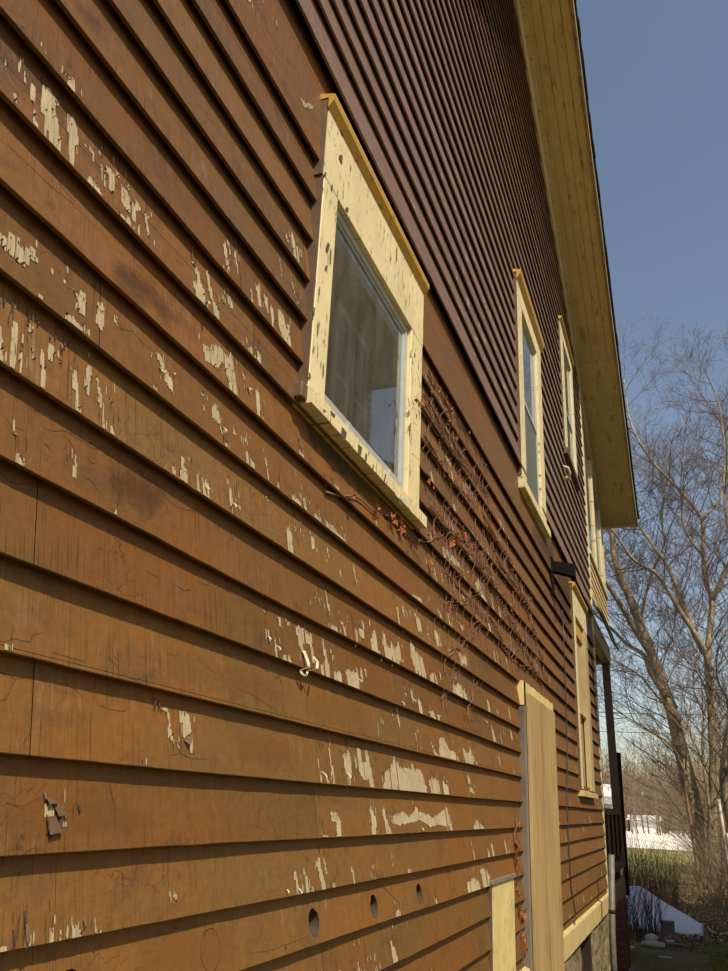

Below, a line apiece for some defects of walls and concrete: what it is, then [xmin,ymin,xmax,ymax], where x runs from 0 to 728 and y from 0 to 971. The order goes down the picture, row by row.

peeling [0,43,155,246]
peeling [0,232,38,267]
peeling [51,266,123,336]
peeling [190,248,234,319]
peeling [248,274,295,347]
peeling [0,297,120,435]
peeling [198,335,264,418]
peeling [264,609,367,689]
peeling [308,528,524,734]
peeling [412,723,477,765]
peeling [317,740,452,835]
peeling [467,810,510,893]